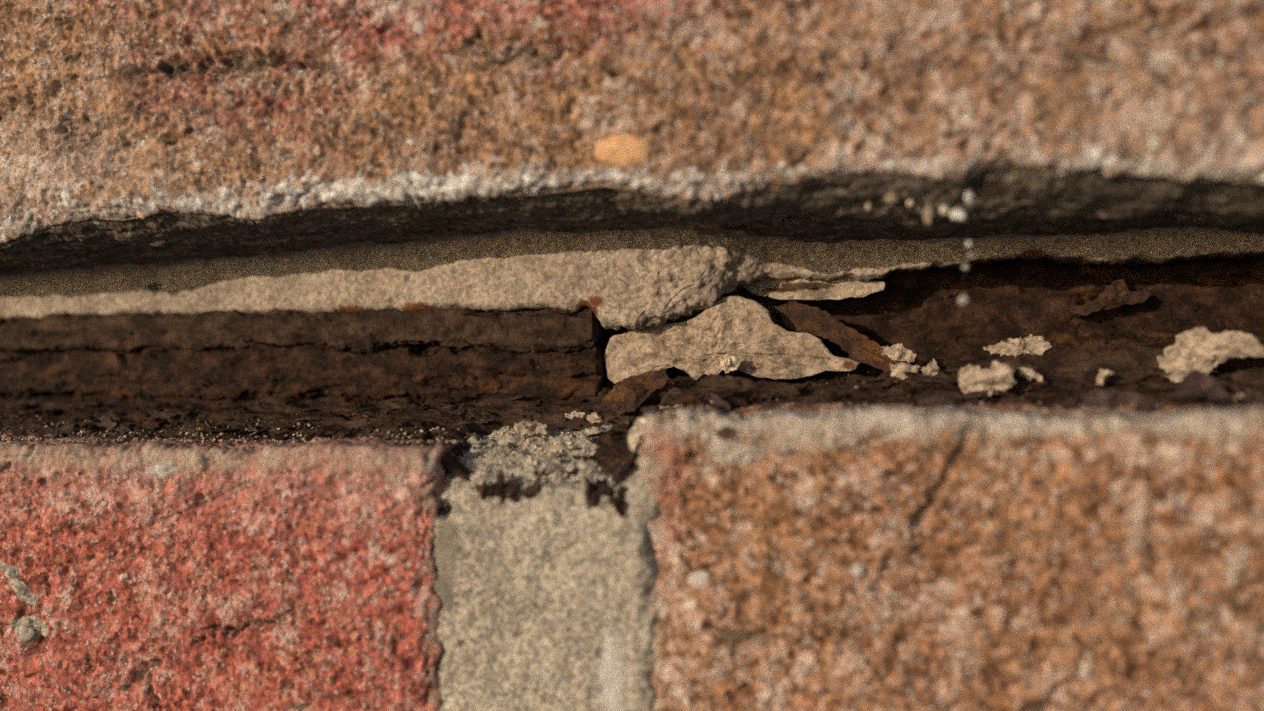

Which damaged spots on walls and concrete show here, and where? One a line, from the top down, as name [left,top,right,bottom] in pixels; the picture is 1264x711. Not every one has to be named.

crack [907,417,977,553]